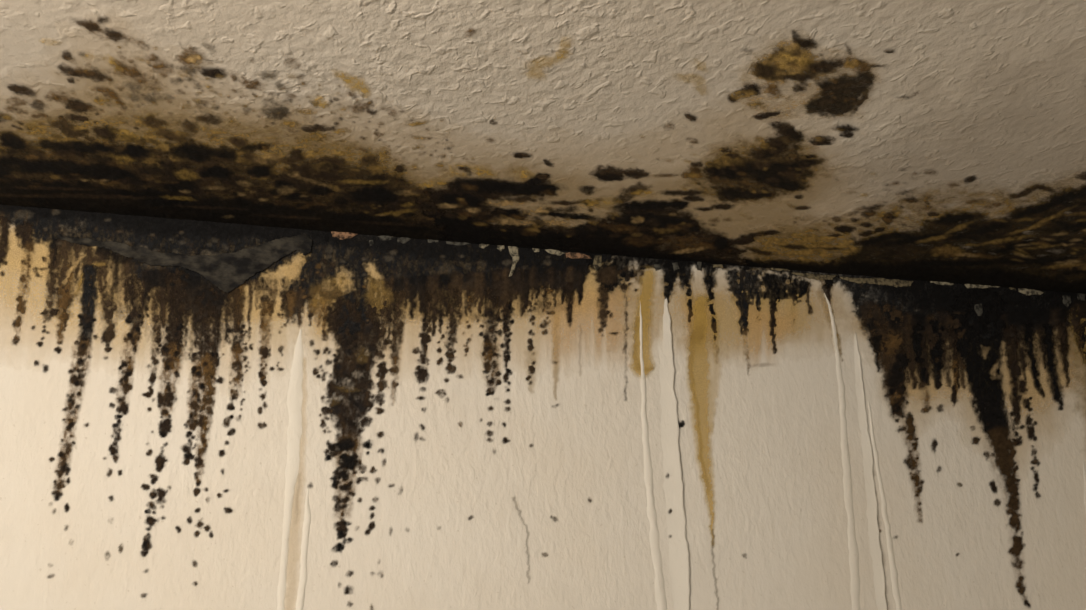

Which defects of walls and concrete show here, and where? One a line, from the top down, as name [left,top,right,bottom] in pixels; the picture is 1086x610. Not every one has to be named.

water stain [76,18,144,48]
water stain [58,65,112,83]
water stain [109,59,160,103]
water stain [140,54,172,77]
water stain [175,48,294,102]
water stain [339,73,376,114]
water stain [728,31,884,120]
water stain [0,84,1086,569]
water stain [1016,576,1030,607]